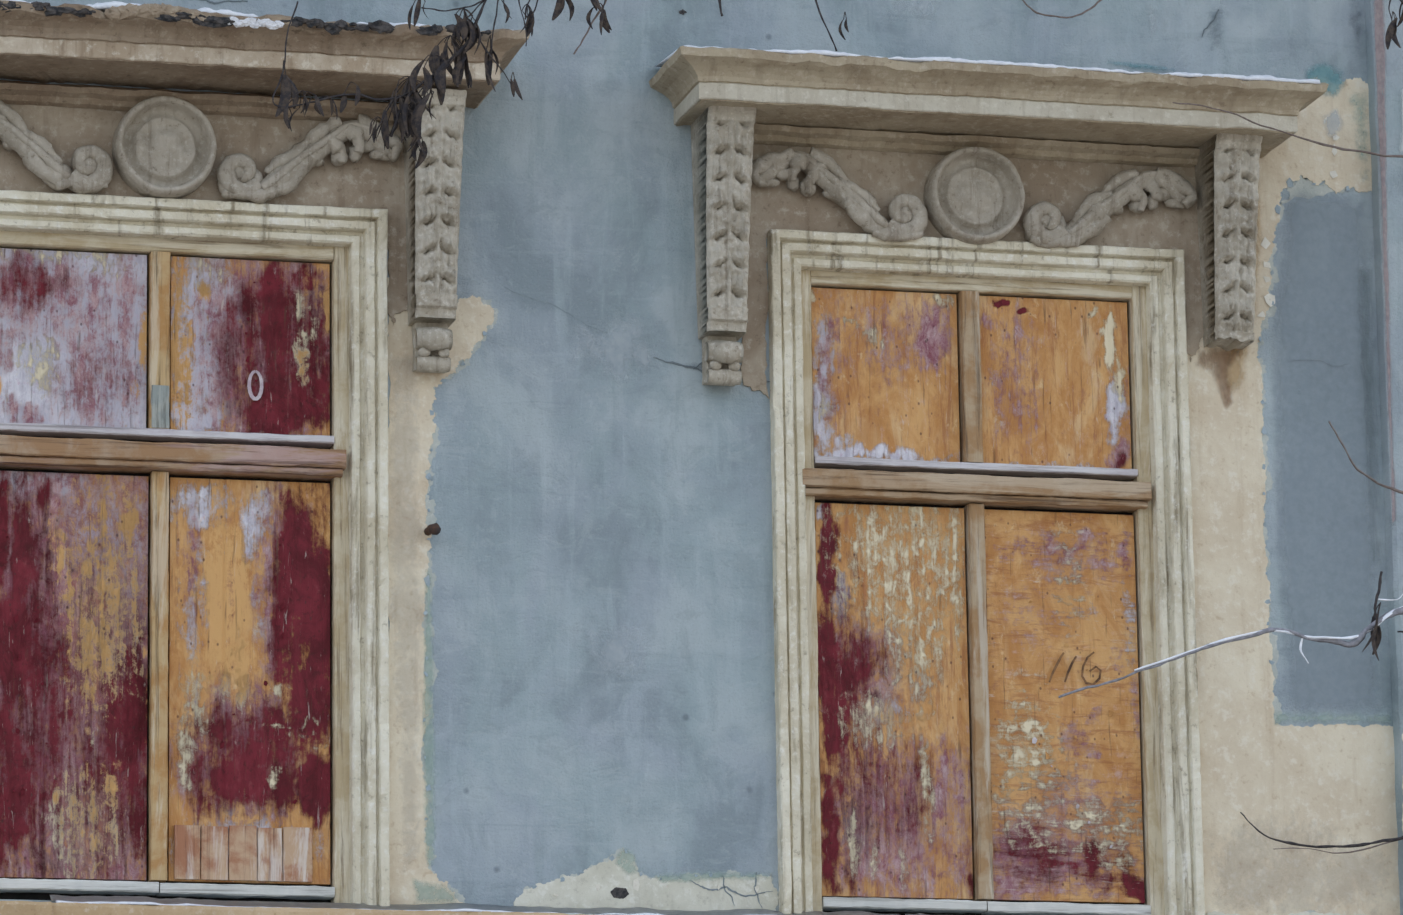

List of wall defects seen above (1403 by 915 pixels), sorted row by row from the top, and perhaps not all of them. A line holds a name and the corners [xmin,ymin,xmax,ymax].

peeling [388,295,499,905]
peeling [513,847,779,911]
crack [690,872,772,907]
peeling [1187,0,1403,915]